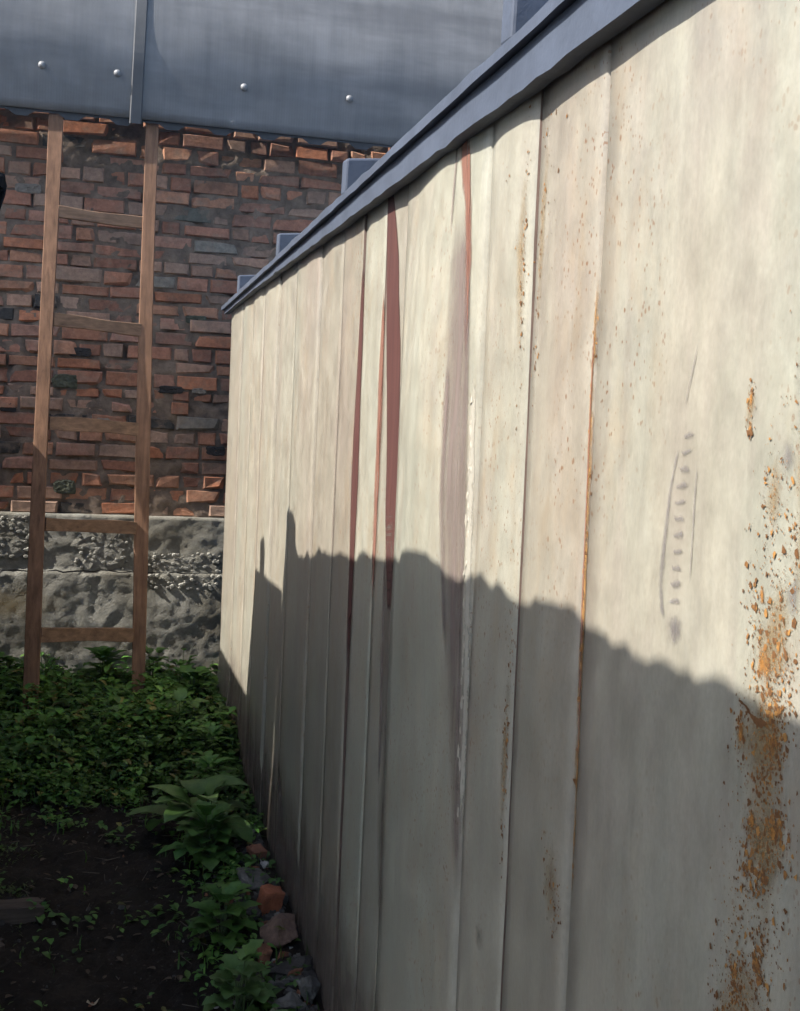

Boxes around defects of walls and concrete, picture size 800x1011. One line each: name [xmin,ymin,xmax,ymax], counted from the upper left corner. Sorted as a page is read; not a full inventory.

rust [347,277,364,650]
rust [371,300,384,588]
leakage [440,243,469,707]
rust [573,296,599,795]
rust [744,378,756,440]
rust [707,395,800,1011]